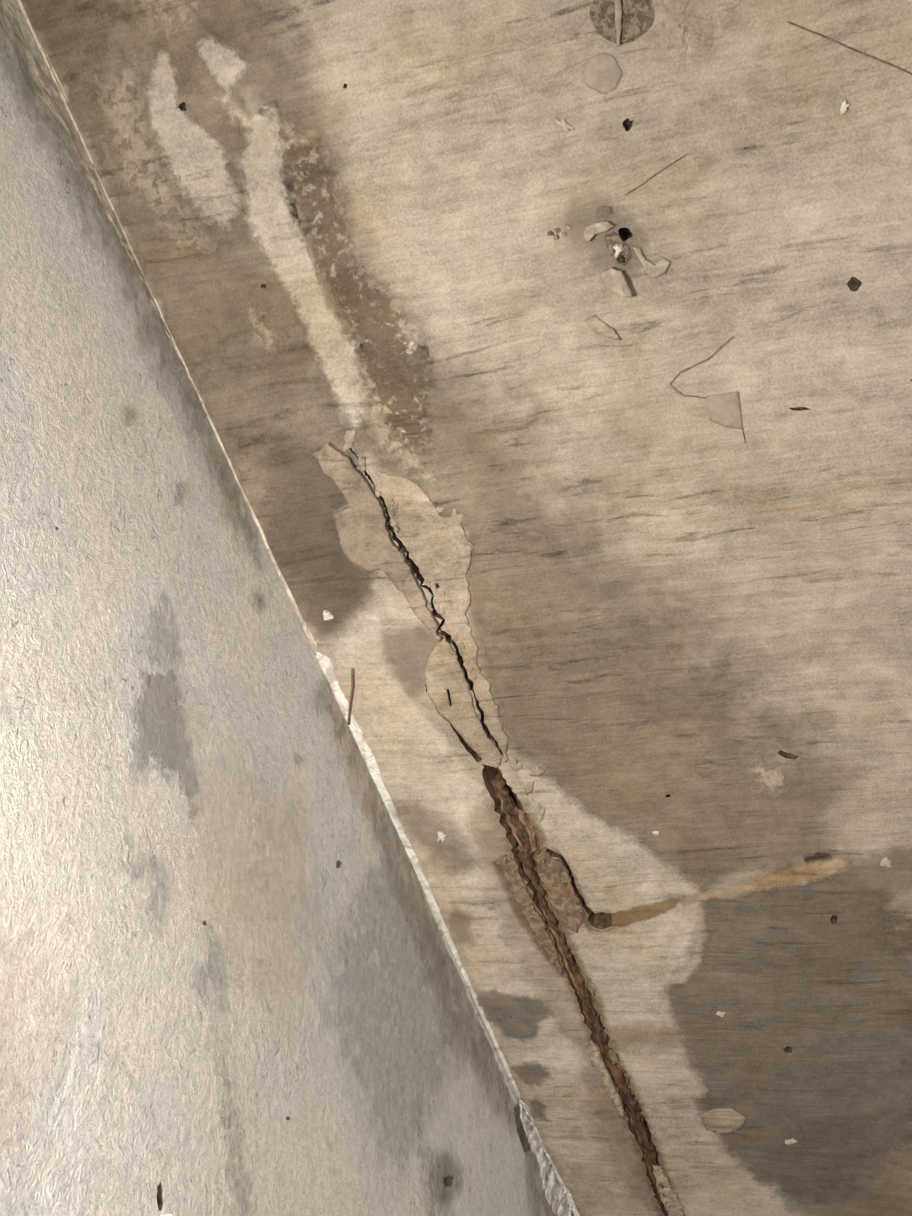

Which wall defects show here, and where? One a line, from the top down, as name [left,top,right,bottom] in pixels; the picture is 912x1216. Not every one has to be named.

peeling [613,244,626,263]
water stain [24,0,650,1216]
crack [350,448,504,763]
spalling [312,427,684,1216]
crack [546,848,613,930]
water stain [360,342,826,891]
water stain [515,769,912,1216]